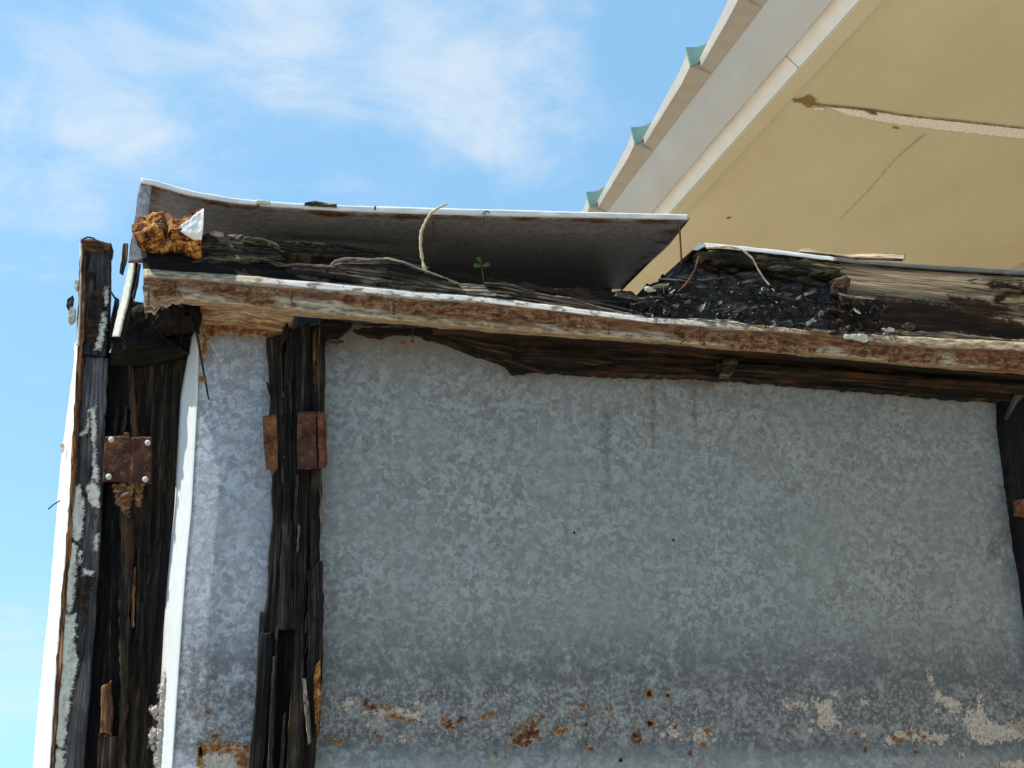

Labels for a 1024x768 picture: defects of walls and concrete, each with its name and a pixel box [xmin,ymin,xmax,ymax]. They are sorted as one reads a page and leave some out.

crack [793,95,1024,129]
rust [149,282,187,304]
rust [202,282,280,307]
rust [334,290,603,332]
rust [198,325,278,382]
rust [665,327,827,356]
rust [843,345,1024,372]
rust [112,483,144,515]
rust [193,729,250,768]
rust [507,701,614,754]
rust [629,728,643,746]
rust [658,718,719,757]